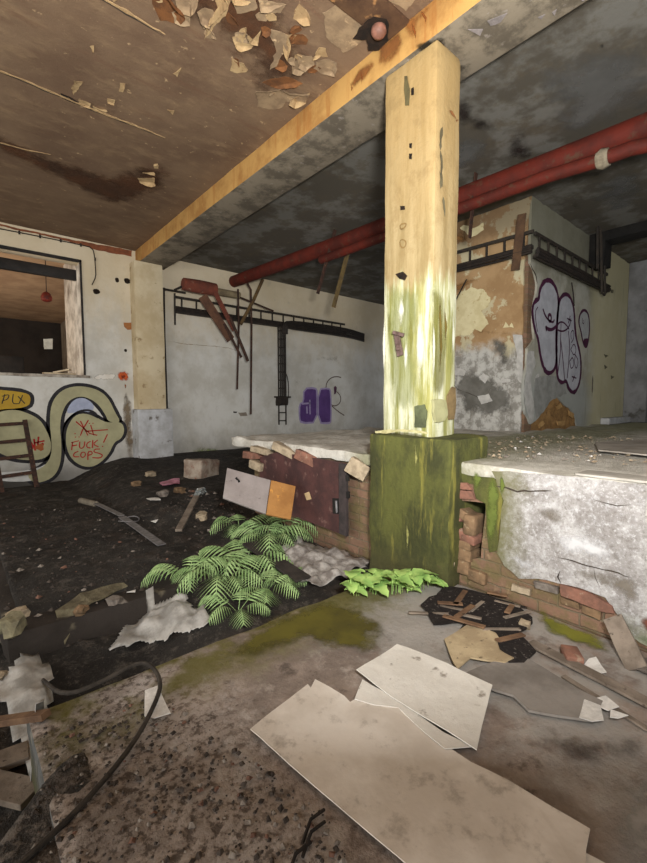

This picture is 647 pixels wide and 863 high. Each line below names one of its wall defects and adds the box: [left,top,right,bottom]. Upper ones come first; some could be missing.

crack [102,0,165,36]
peeling [152,0,389,110]
crack [0,70,165,139]
peeling [61,81,125,113]
water stain [0,141,160,202]
peeling [460,223,484,237]
water stain [404,306,455,373]
peeling [455,287,491,337]
peeling [501,322,523,383]
water stain [474,474,505,536]
crack [497,485,549,493]
crack [557,557,631,583]